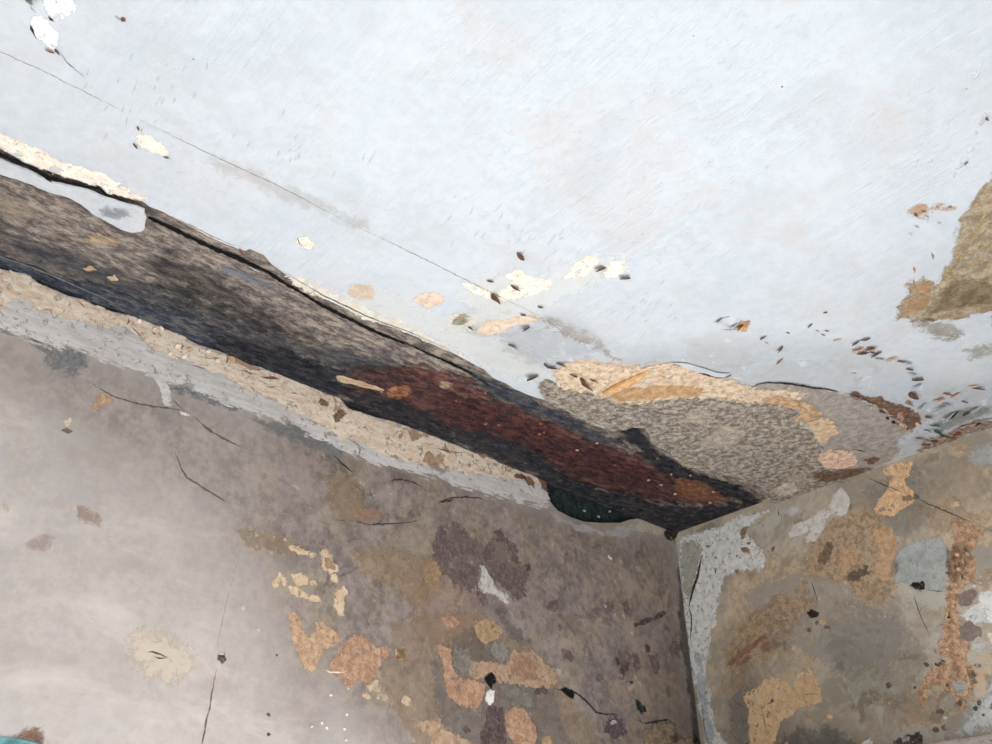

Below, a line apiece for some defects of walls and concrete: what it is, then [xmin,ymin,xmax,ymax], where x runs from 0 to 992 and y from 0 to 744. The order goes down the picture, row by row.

flaking render [25,0,84,77]
peeling [133,126,170,159]
damp [896,180,992,341]
crack [93,384,240,447]
flaking render [0,133,924,744]
flaking render [916,411,992,465]
crack [175,453,226,502]
peeling [891,501,992,738]
crack [202,673,216,743]
crack [557,689,675,725]
damp [892,732,923,744]